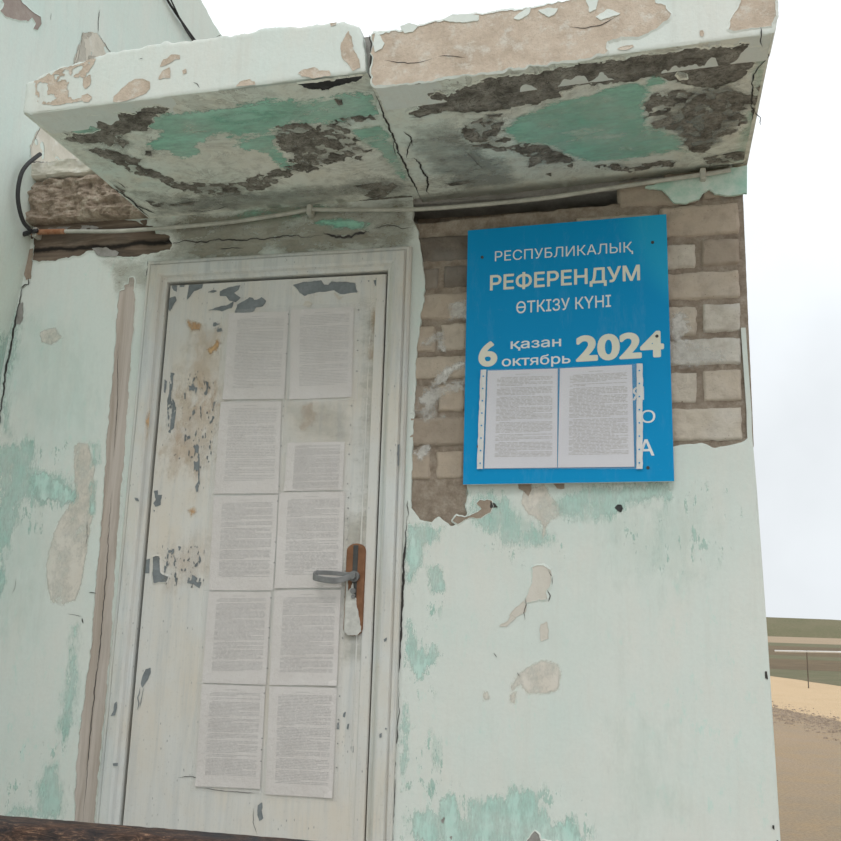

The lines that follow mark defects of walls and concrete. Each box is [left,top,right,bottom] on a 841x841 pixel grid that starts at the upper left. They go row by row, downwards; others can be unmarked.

peeling [0,0,42,31]
peeling [34,32,96,105]
crack [374,92,429,196]
peeling [62,0,779,207]
crack [0,278,29,422]
peeling [168,284,266,313]
spalling [164,370,215,492]
peeling [18,443,94,603]
spalling [145,545,205,588]
peeling [499,563,554,627]
peeling [510,661,561,702]
peeling [401,704,587,841]